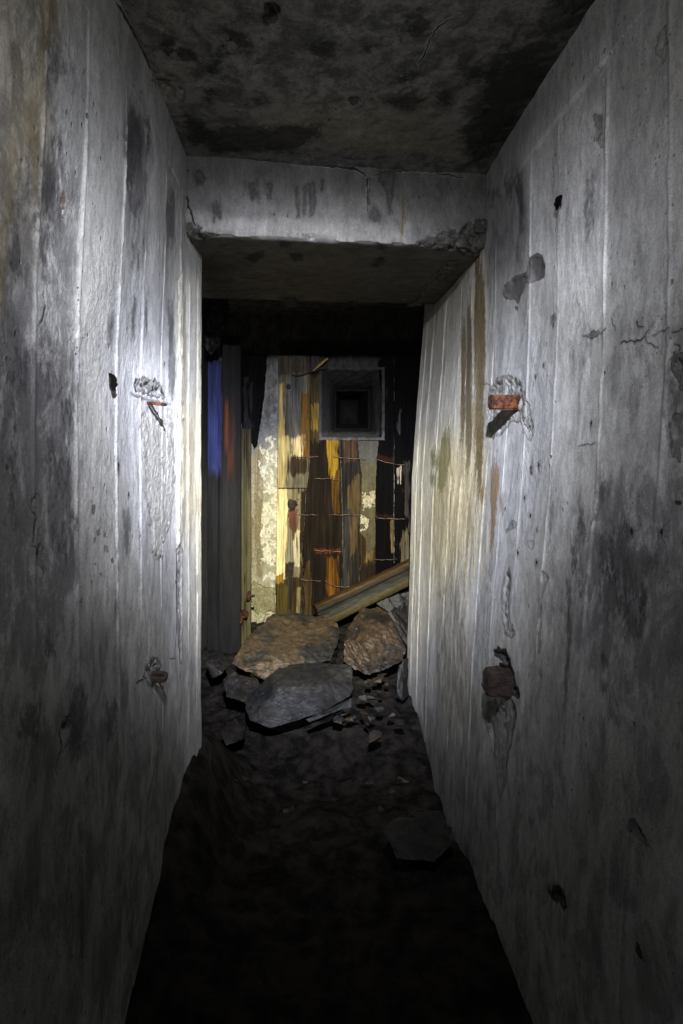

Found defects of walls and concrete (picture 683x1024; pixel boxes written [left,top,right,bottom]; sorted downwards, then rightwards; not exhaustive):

leakage [183,115,322,153]
crack [186,193,197,229]
leakage [295,179,324,219]
spalling [416,219,488,259]
peeling [503,253,545,311]
crack [582,317,683,353]
spalling [134,376,166,399]
spalling [487,373,534,441]
flaking render [251,399,278,624]
spalling [481,567,520,798]